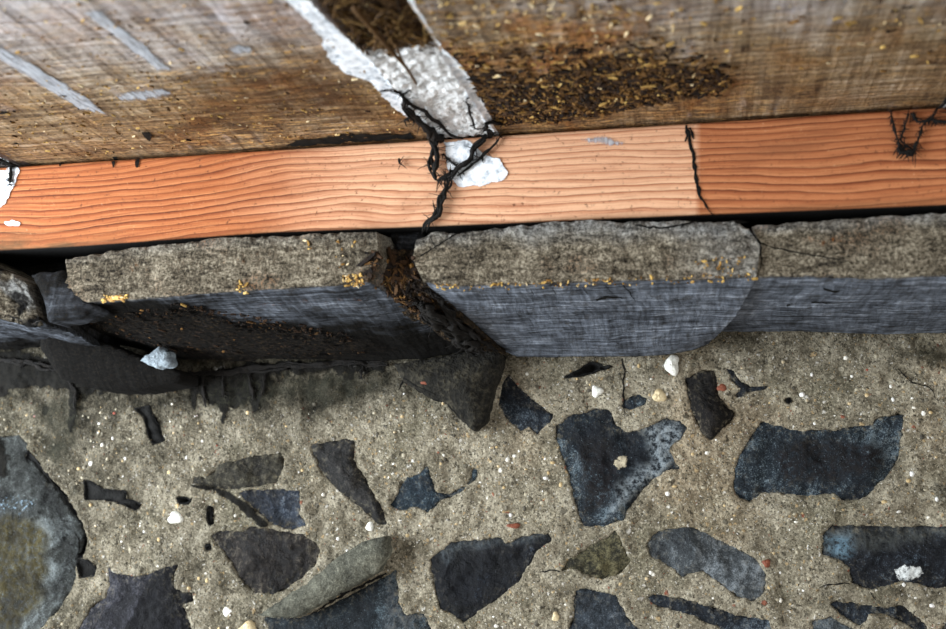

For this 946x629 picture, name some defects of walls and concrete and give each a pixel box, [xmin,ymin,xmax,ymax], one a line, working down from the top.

crack [635,125,848,274]